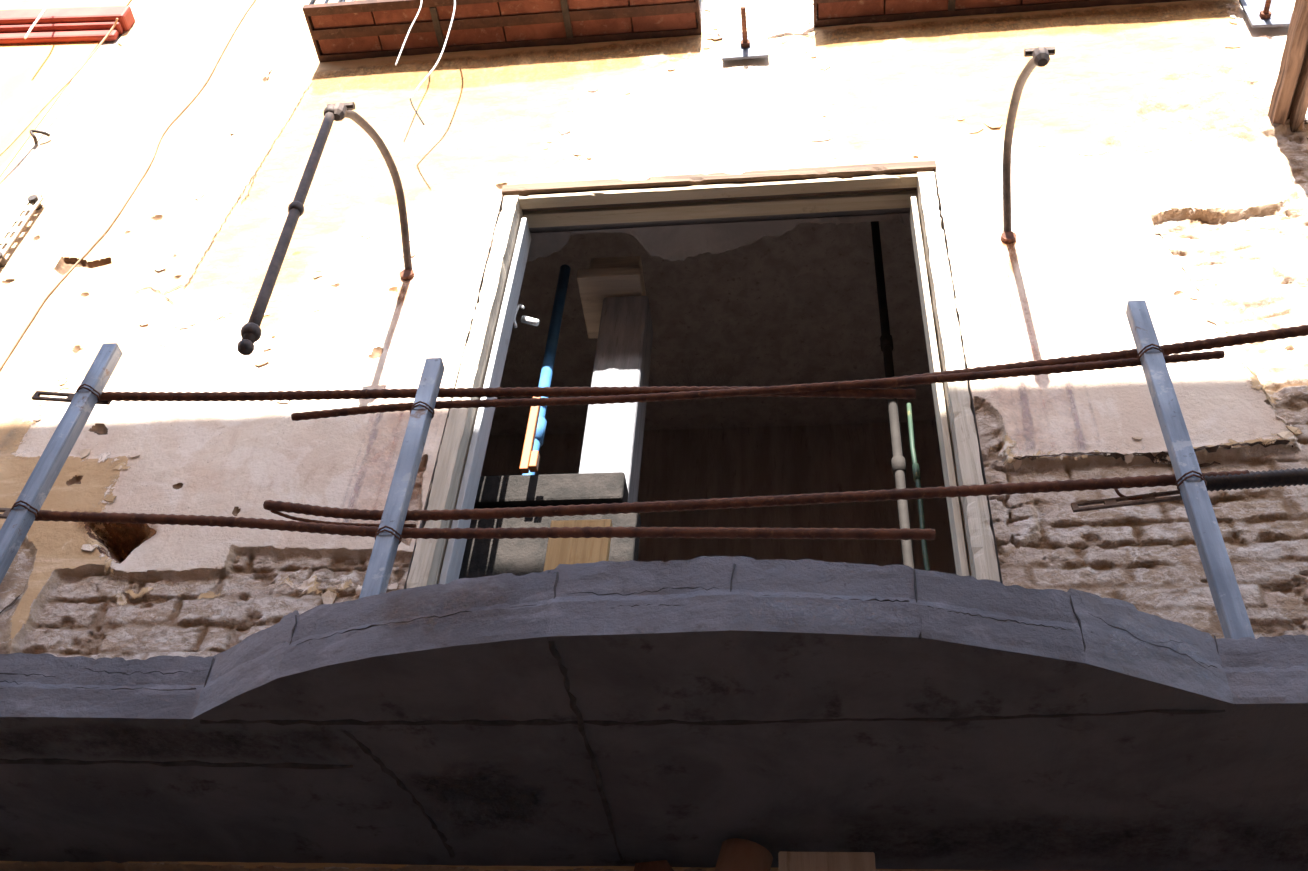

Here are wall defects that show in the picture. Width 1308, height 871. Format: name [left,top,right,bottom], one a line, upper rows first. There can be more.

peeling [0,0,1308,660]